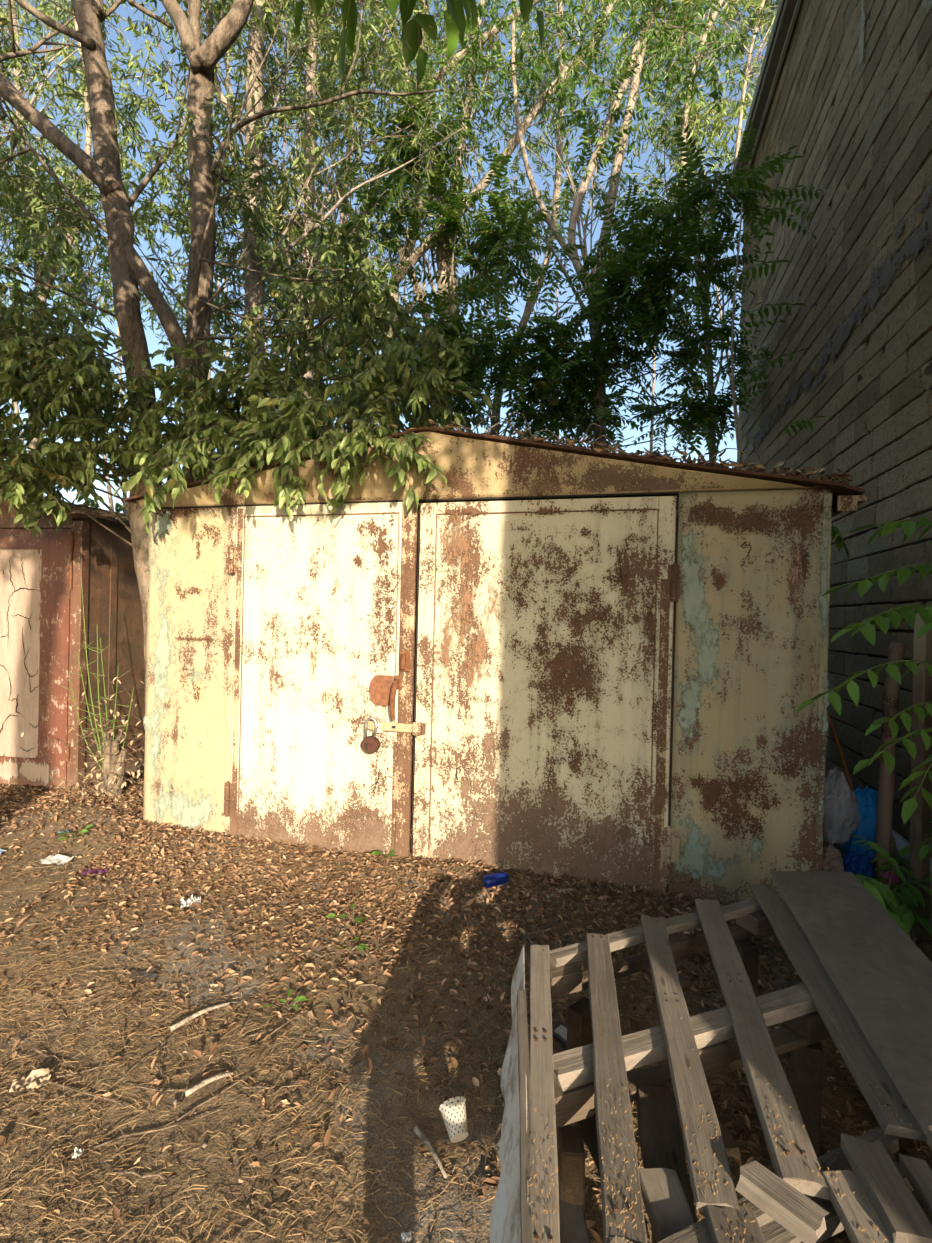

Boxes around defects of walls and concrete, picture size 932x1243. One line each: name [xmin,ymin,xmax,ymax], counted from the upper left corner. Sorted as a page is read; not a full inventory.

rust [165,585,206,602]
rust [151,507,234,559]
rust [303,464,400,671]
crack [0,559,41,752]
rust [409,453,824,906]
rust [341,686,393,758]
rust [236,782,392,855]